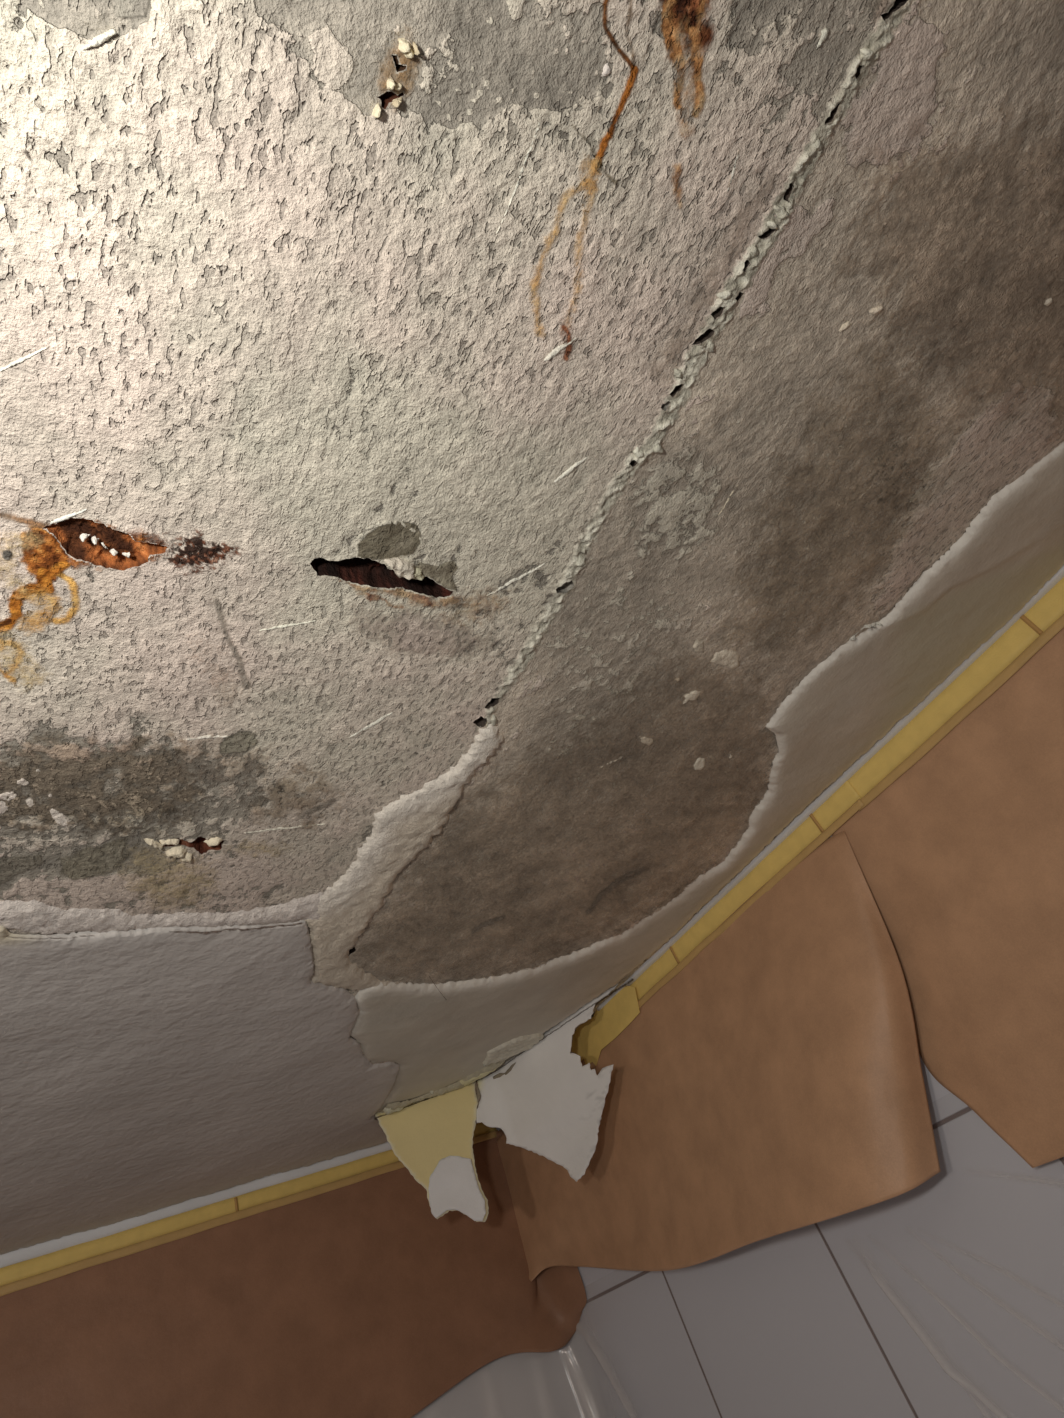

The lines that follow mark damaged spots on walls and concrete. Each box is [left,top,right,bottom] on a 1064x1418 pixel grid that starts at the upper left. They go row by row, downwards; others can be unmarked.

rust [547,0,638,245]
rust [660,0,713,117]
rust [544,325,576,361]
crack [473,0,915,729]
leakage [859,118,1064,444]
rust [0,513,89,682]
rust [128,530,238,573]
leakage [360,609,478,655]
leakage [730,345,933,645]
leakage [0,736,253,836]
peeling [0,441,1064,1255]
leakage [362,656,774,975]